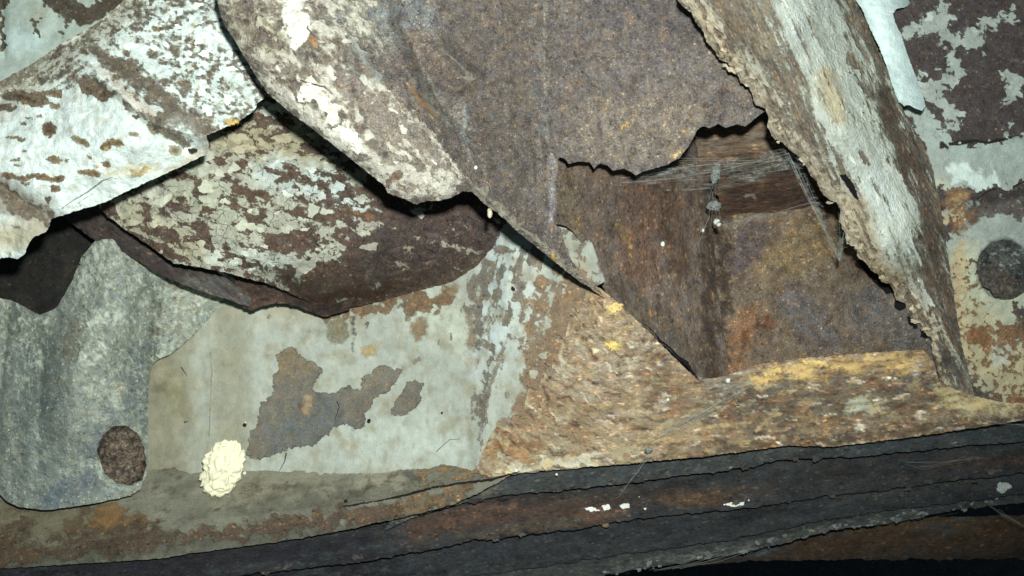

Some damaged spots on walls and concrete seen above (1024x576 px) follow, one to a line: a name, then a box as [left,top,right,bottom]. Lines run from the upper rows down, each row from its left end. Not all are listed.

peeling [147,3,251,116]
peeling [256,13,311,72]
peeling [296,66,337,102]
peeling [856,0,960,118]
peeling [118,106,320,235]
peeling [350,108,417,173]
peeling [197,181,366,274]
peeling [358,229,381,251]
peeling [869,259,935,331]
peeling [246,346,424,460]
rust [475,286,1024,477]
rust [64,471,125,536]